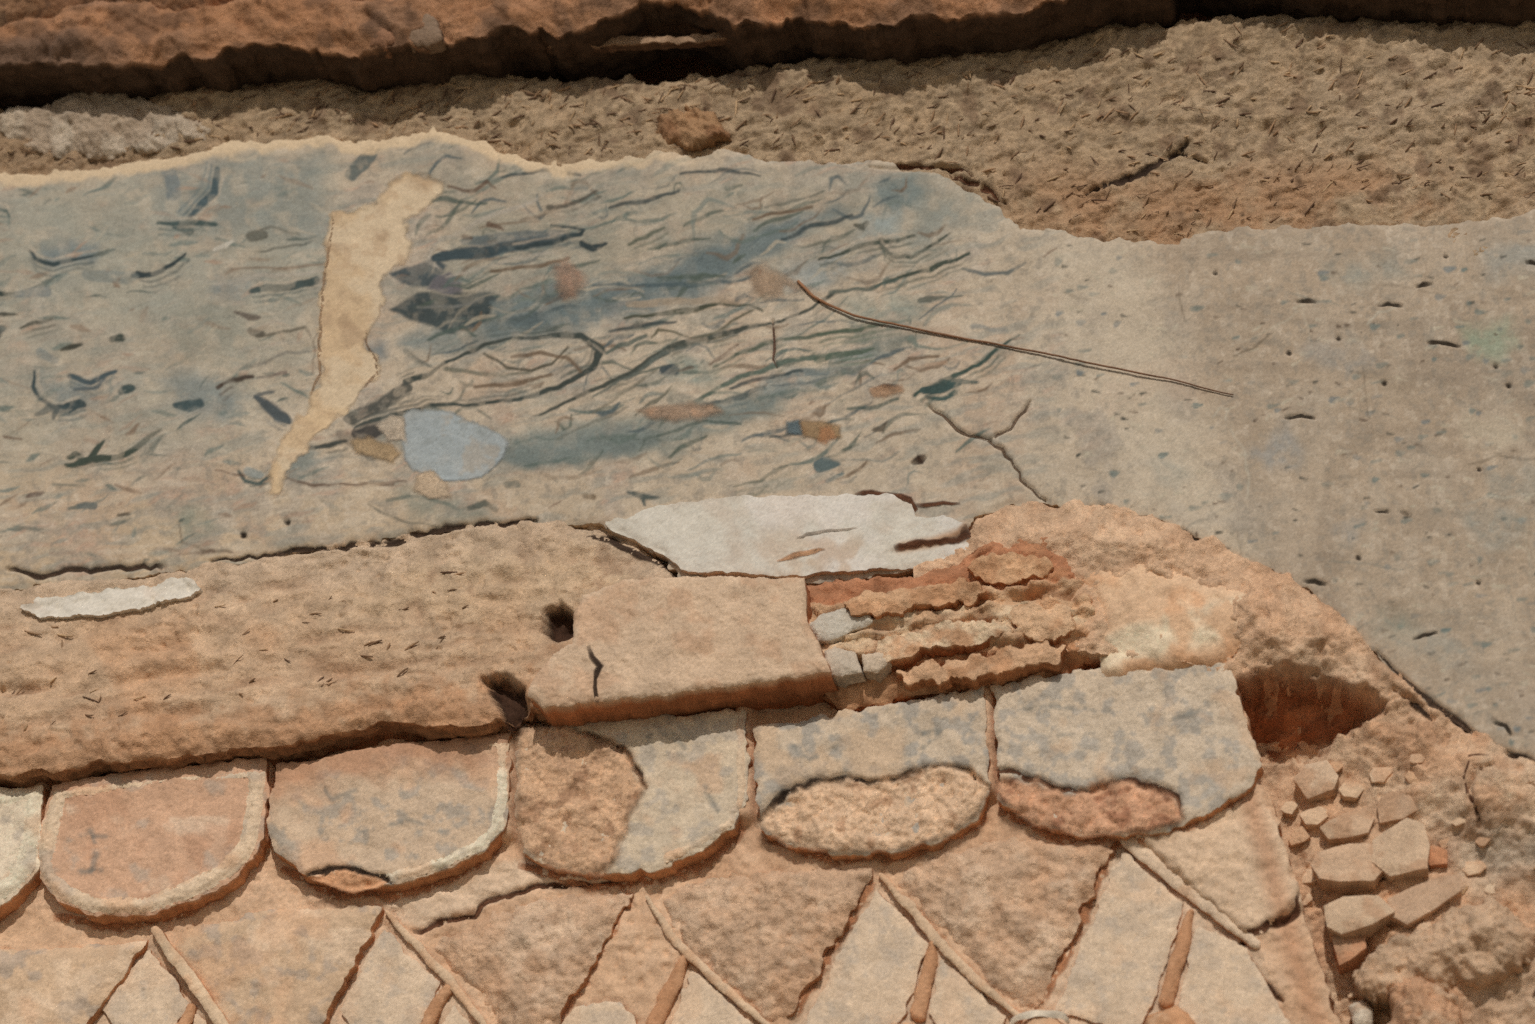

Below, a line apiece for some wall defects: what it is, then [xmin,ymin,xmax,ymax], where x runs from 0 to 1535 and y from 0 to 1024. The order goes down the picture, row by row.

crack [896,164,1004,204]
crack [1088,144,1203,195]
peeling [270,172,443,494]
peeling [352,409,508,498]
crack [931,404,1043,500]
spalling [807,537,1097,712]
spalling [1239,685,1360,760]